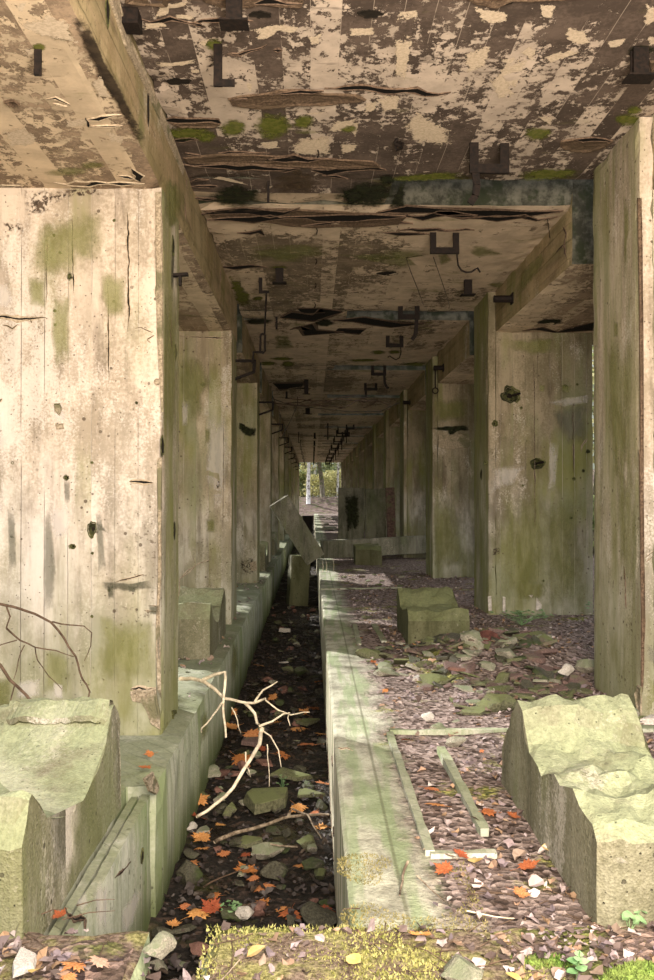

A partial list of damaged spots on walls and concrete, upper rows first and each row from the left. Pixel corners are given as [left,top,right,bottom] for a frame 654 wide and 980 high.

peeling [397,10,419,22]
peeling [469,0,564,23]
peeling [644,3,654,45]
peeling [394,35,412,80]
peeling [465,46,491,72]
peeling [490,27,591,99]
crack [324,84,451,97]
peeling [394,112,452,152]
water stain [32,281,43,302]
water stain [104,278,122,312]
water stain [54,305,67,351]
water stain [45,522,54,595]